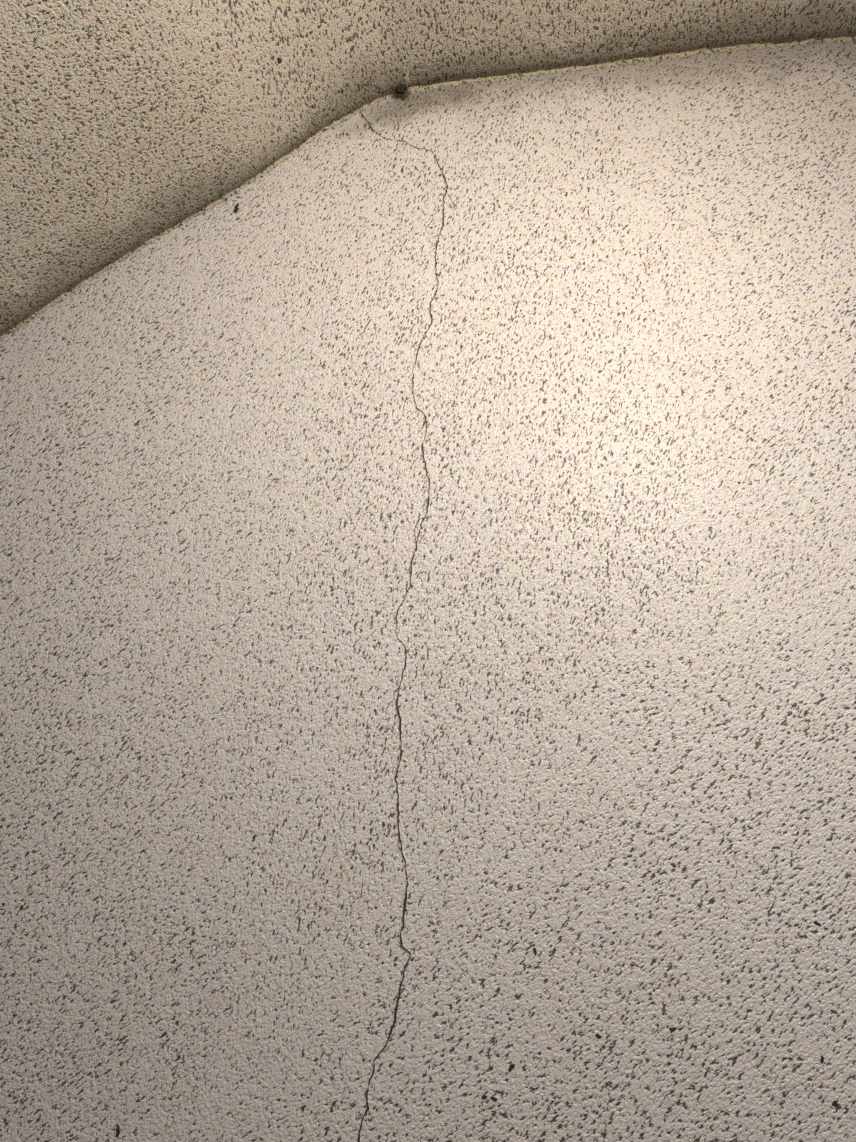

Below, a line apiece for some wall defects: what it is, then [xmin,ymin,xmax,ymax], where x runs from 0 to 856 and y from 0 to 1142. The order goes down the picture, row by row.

crack [356,112,458,1142]